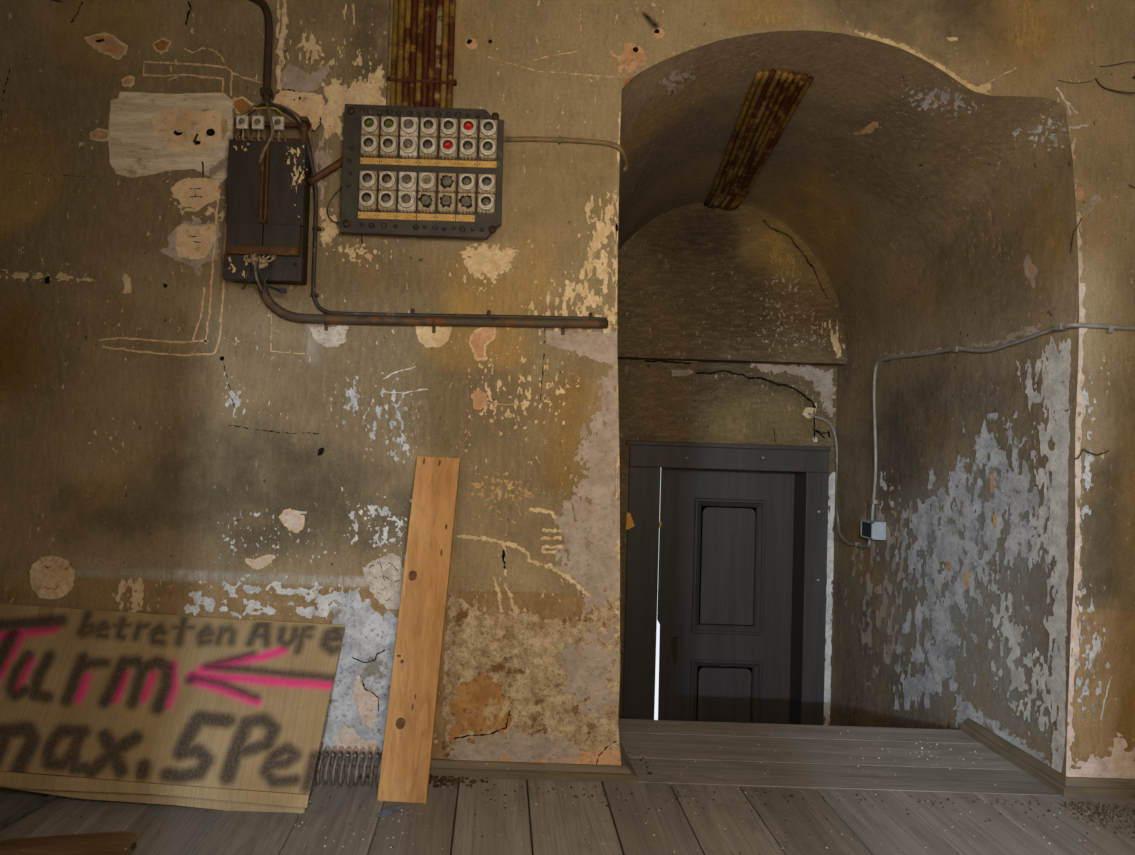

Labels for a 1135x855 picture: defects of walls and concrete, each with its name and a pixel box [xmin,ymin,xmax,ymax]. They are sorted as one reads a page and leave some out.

peeling [276,0,392,269]
peeling [521,112,621,335]
crack [763,220,828,299]
spalling [463,327,579,446]
flaking render [441,365,620,760]
crack [644,360,830,440]
peeling [844,179,1111,777]
spalling [332,675,381,757]